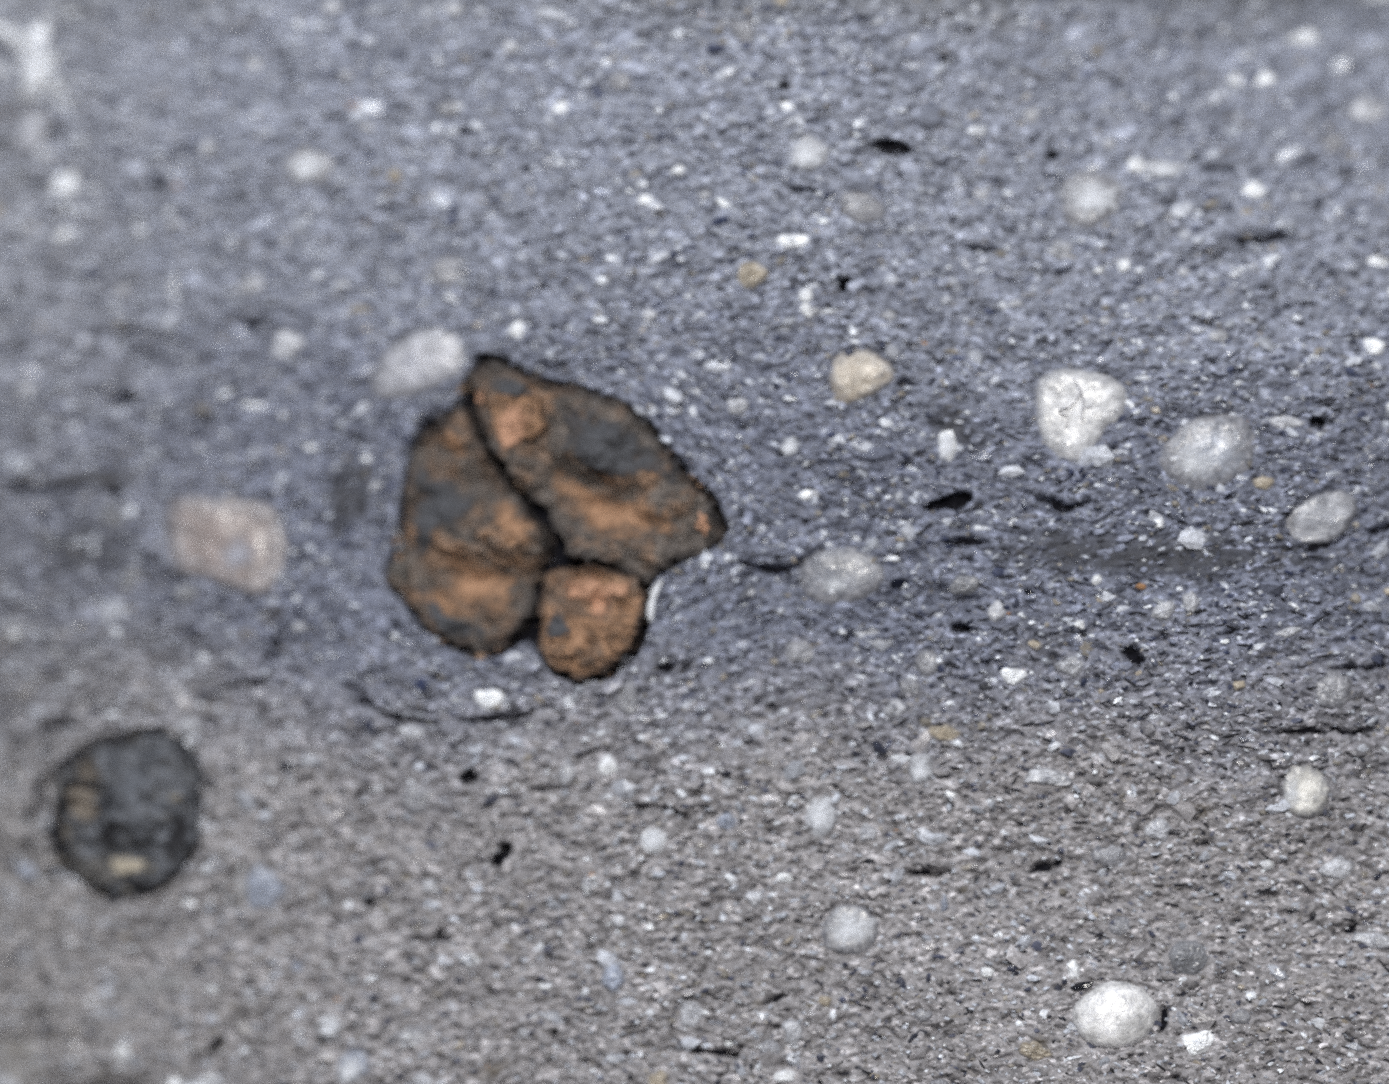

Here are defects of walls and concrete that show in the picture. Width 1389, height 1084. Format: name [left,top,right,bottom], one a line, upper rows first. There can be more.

corrosion [497,406,530,449]
corrosion [496,502,529,543]
corrosion [555,471,670,539]
corrosion [695,512,709,536]
corrosion [449,557,515,609]
corrosion [565,576,629,616]
corrosion [571,630,589,651]